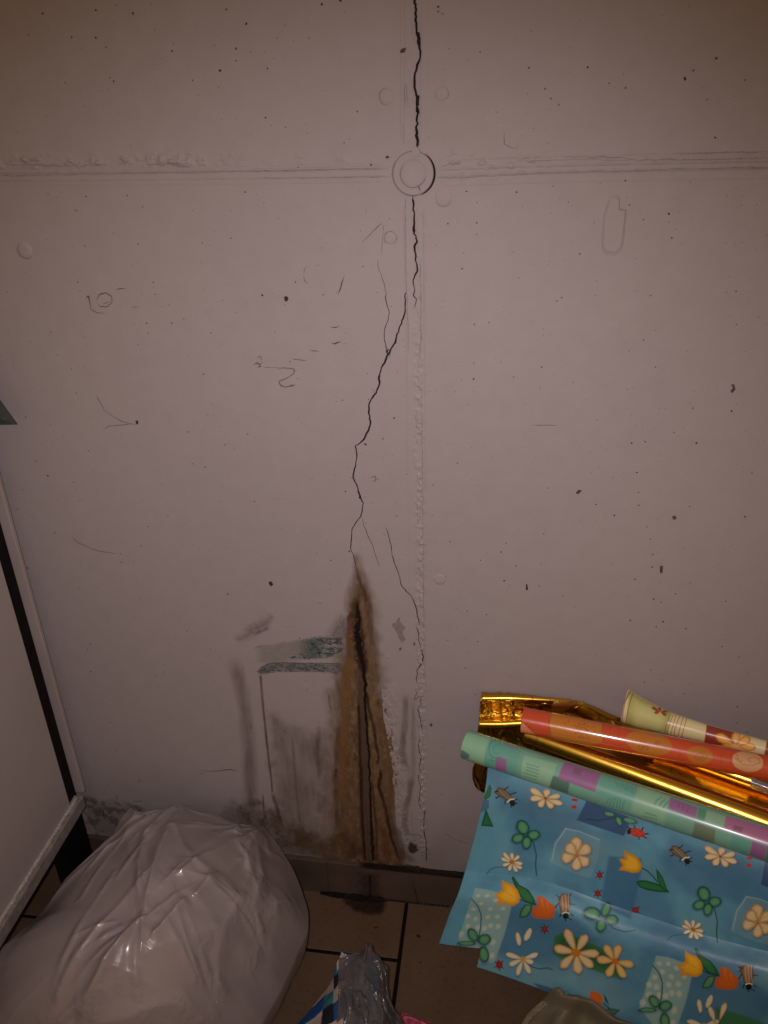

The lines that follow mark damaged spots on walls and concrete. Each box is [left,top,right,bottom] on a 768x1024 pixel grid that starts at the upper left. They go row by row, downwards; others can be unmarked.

crack [413,0,421,147]
crack [350,186,427,861]
rust [332,572,402,865]